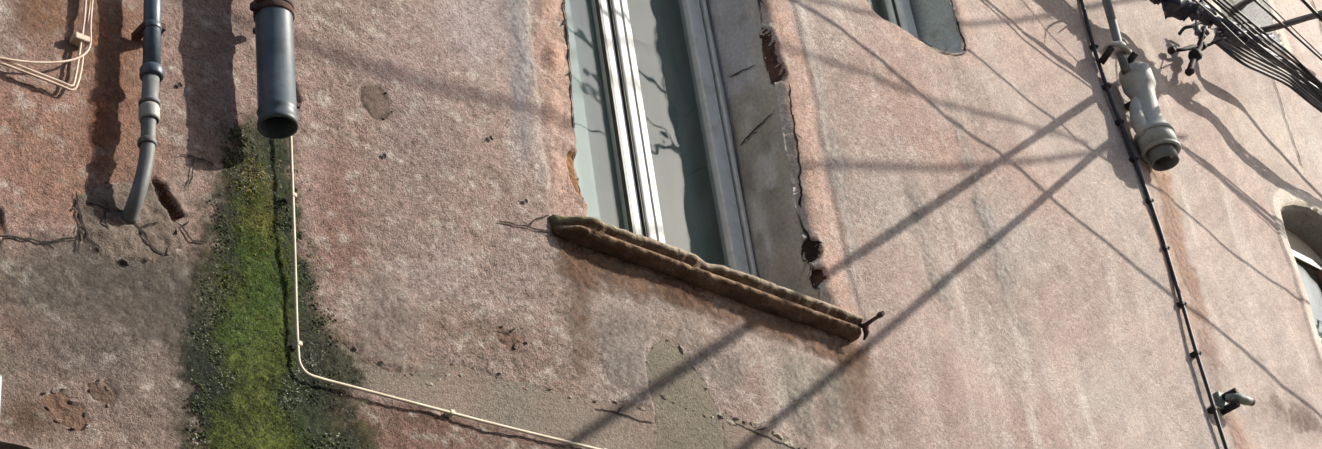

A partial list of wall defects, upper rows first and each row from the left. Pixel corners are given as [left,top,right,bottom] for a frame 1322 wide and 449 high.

crack [757,0,765,23]
spalling [759,27,786,83]
spalling [566,151,583,198]
crack [740,83,824,300]
flaking render [338,341,808,449]